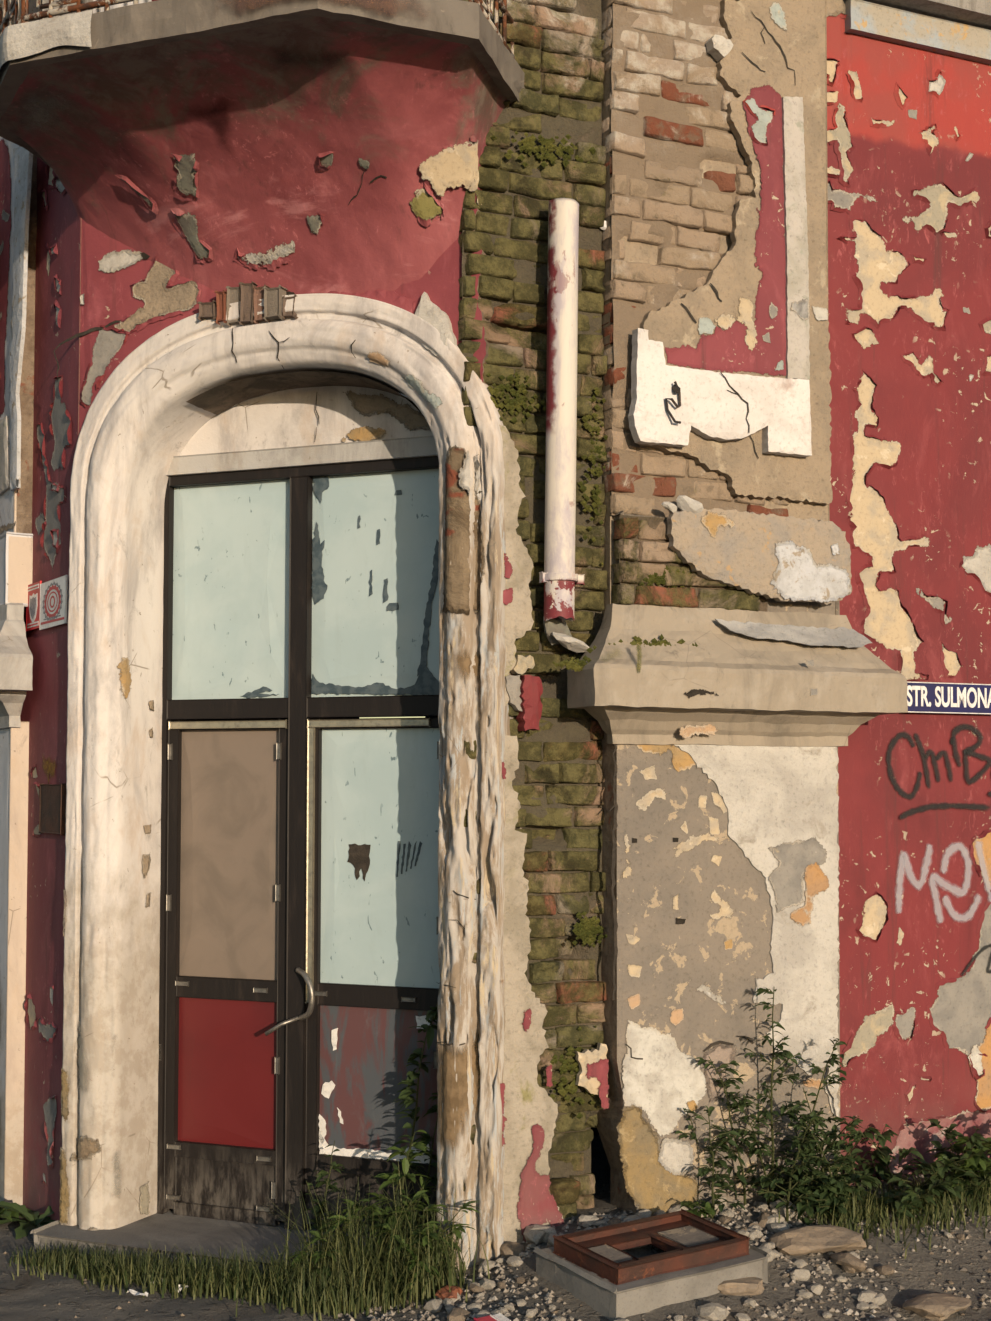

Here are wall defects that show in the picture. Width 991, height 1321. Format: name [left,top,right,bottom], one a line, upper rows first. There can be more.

peeling [743,98,775,146]
peeling [827,56,991,349]
peeling [35,240,299,569]
crack [720,372,759,458]
peeling [698,297,828,351]
peeling [901,350,944,387]
peeling [770,369,964,682]
peeling [960,544,991,596]
peeling [635,723,718,811]
peeling [768,837,829,926]
peeling [842,828,991,1182]
peeling [616,964,737,1215]